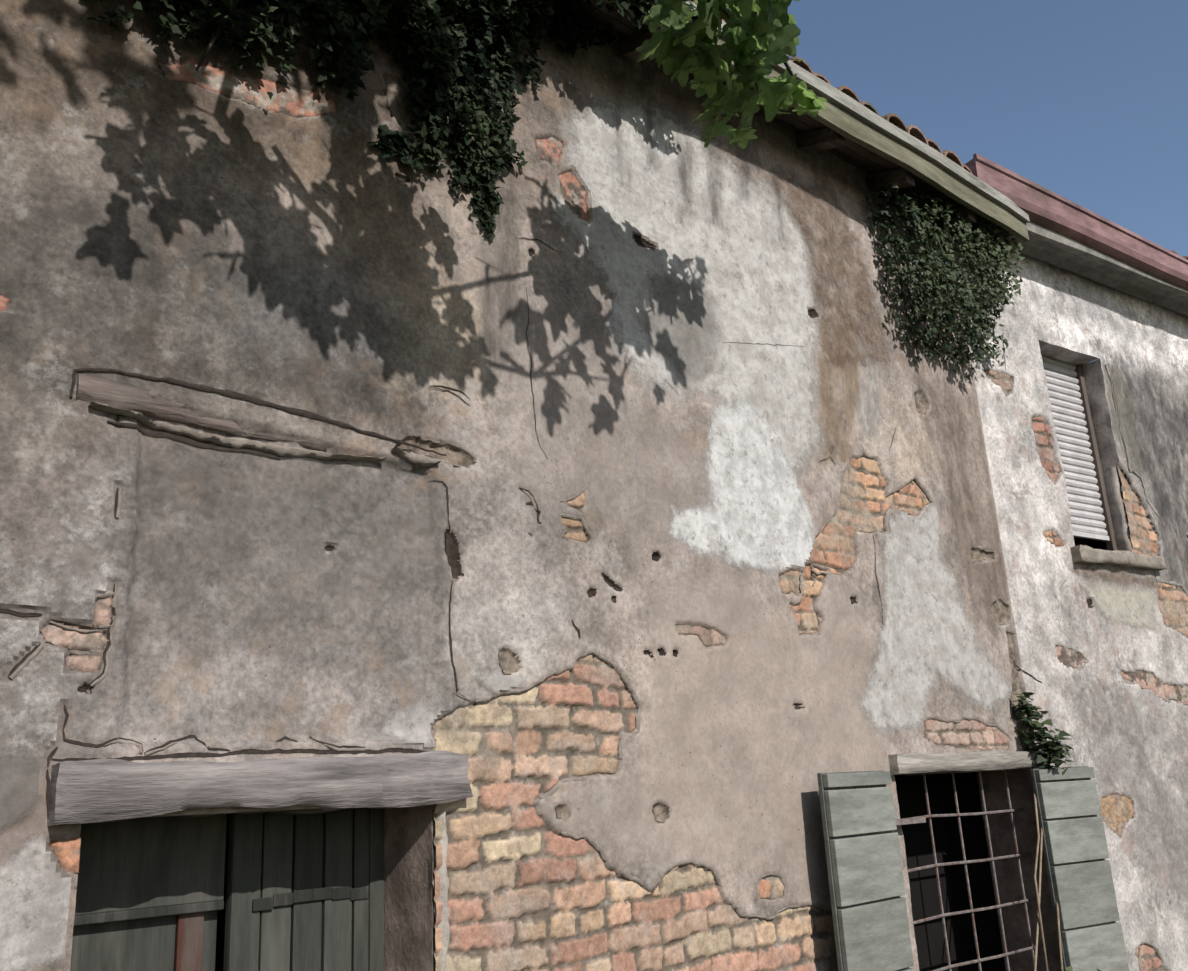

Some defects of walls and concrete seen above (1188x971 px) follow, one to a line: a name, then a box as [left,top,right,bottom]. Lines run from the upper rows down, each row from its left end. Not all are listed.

spalling [159,56,338,120]
peeling [535,102,1025,752]
spalling [1030,416,1063,485]
crack [114,487,122,518]
crack [429,480,451,536]
flaking render [40,591,117,693]
crack [0,584,427,818]
crack [449,580,470,701]
spalling [1120,669,1188,705]
spalling [1157,582,1188,638]
spalling [432,648,838,971]
peeling [0,837,81,971]